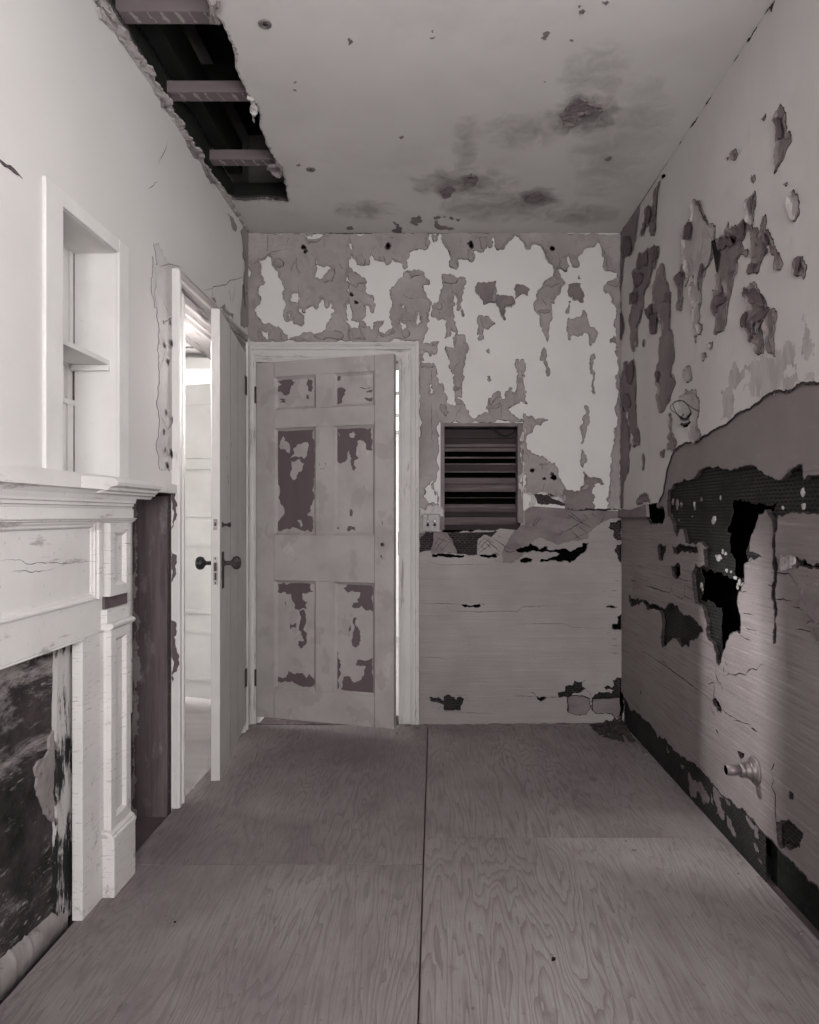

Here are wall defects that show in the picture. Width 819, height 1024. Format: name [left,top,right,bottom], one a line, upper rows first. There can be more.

flaking render [95,0,291,232]
leakage [561,98,604,128]
leakage [439,173,478,199]
peeling [278,430,315,532]
peeling [337,428,373,470]
spalling [445,438,516,478]
flaking render [606,314,819,665]
peeling [278,583,313,648]
peeling [337,585,373,693]
crack [642,533,811,733]
spalling [33,730,55,822]
flaking render [536,677,819,931]